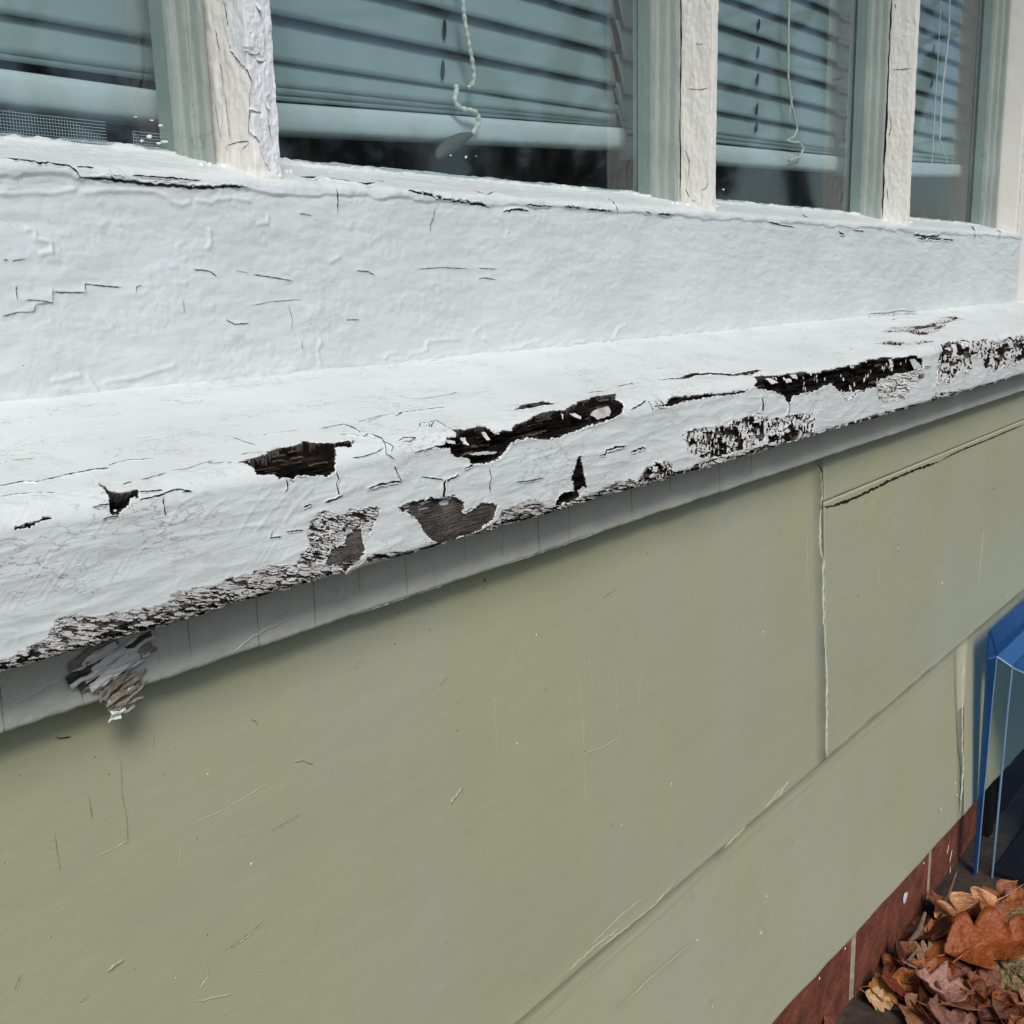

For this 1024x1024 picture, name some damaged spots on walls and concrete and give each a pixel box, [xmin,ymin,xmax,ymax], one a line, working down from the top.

peeling [224,0,282,175]
crack [2,283,141,317]
crack [226,271,303,350]
crack [588,383,667,411]
crack [1,393,544,538]
peeling [0,311,1024,673]
crack [599,445,646,458]
crack [817,425,1022,508]
crack [227,507,605,654]